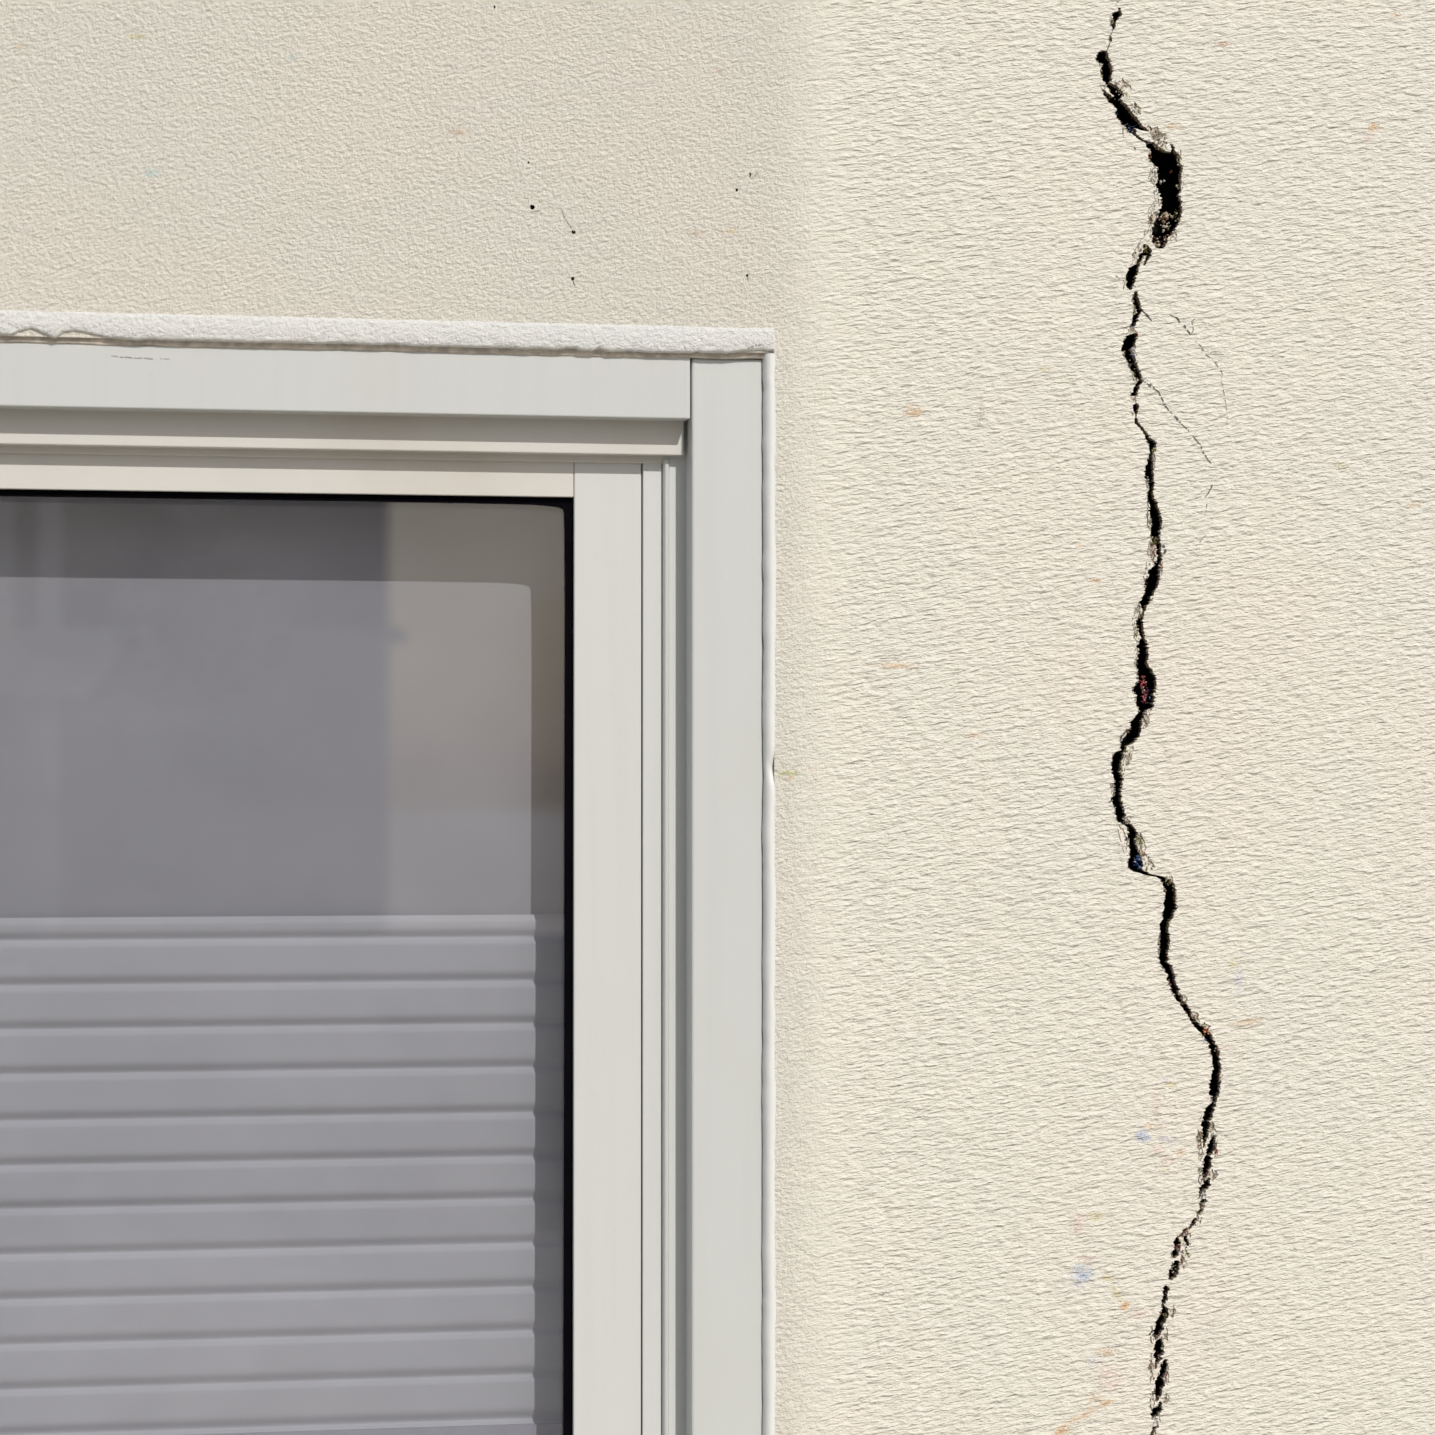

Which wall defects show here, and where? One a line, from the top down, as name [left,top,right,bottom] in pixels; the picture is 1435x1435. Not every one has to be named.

crack [1095,8,1230,1435]